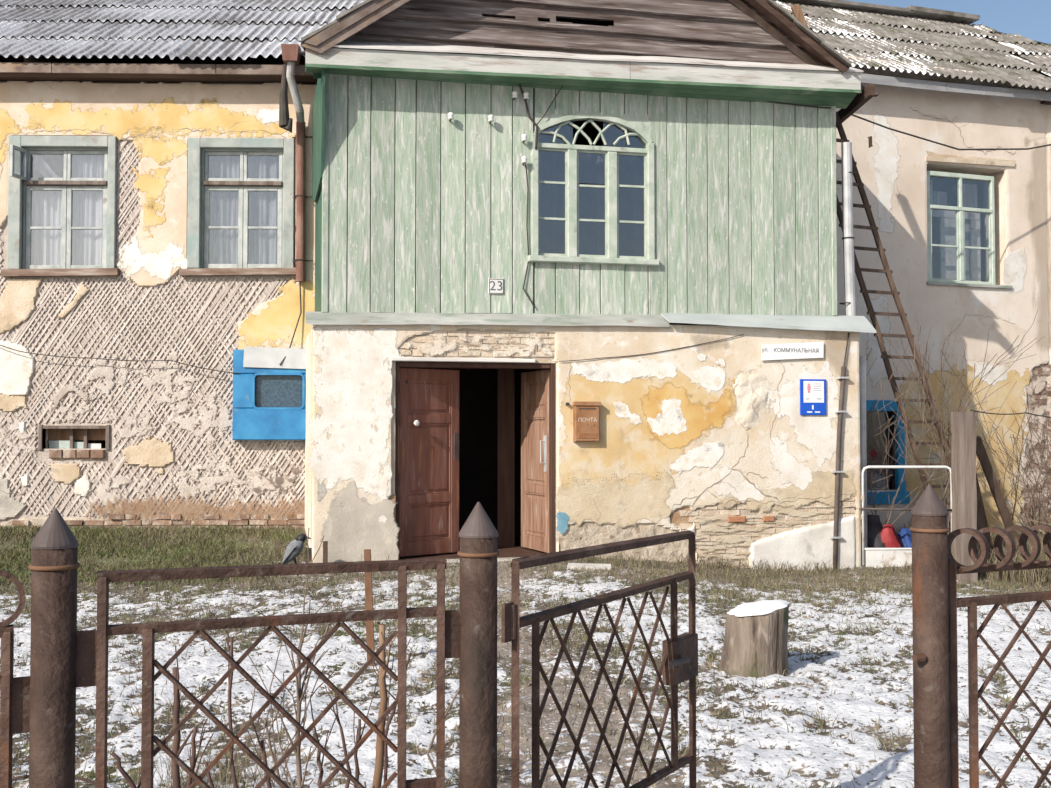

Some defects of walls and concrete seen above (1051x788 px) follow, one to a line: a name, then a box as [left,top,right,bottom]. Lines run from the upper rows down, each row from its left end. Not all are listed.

peeling [0,97,296,238]
peeling [868,113,901,233]
peeling [235,274,315,349]
flaking render [397,330,555,359]
peeling [556,354,865,568]
crack [672,362,853,515]
peeling [900,308,1051,534]